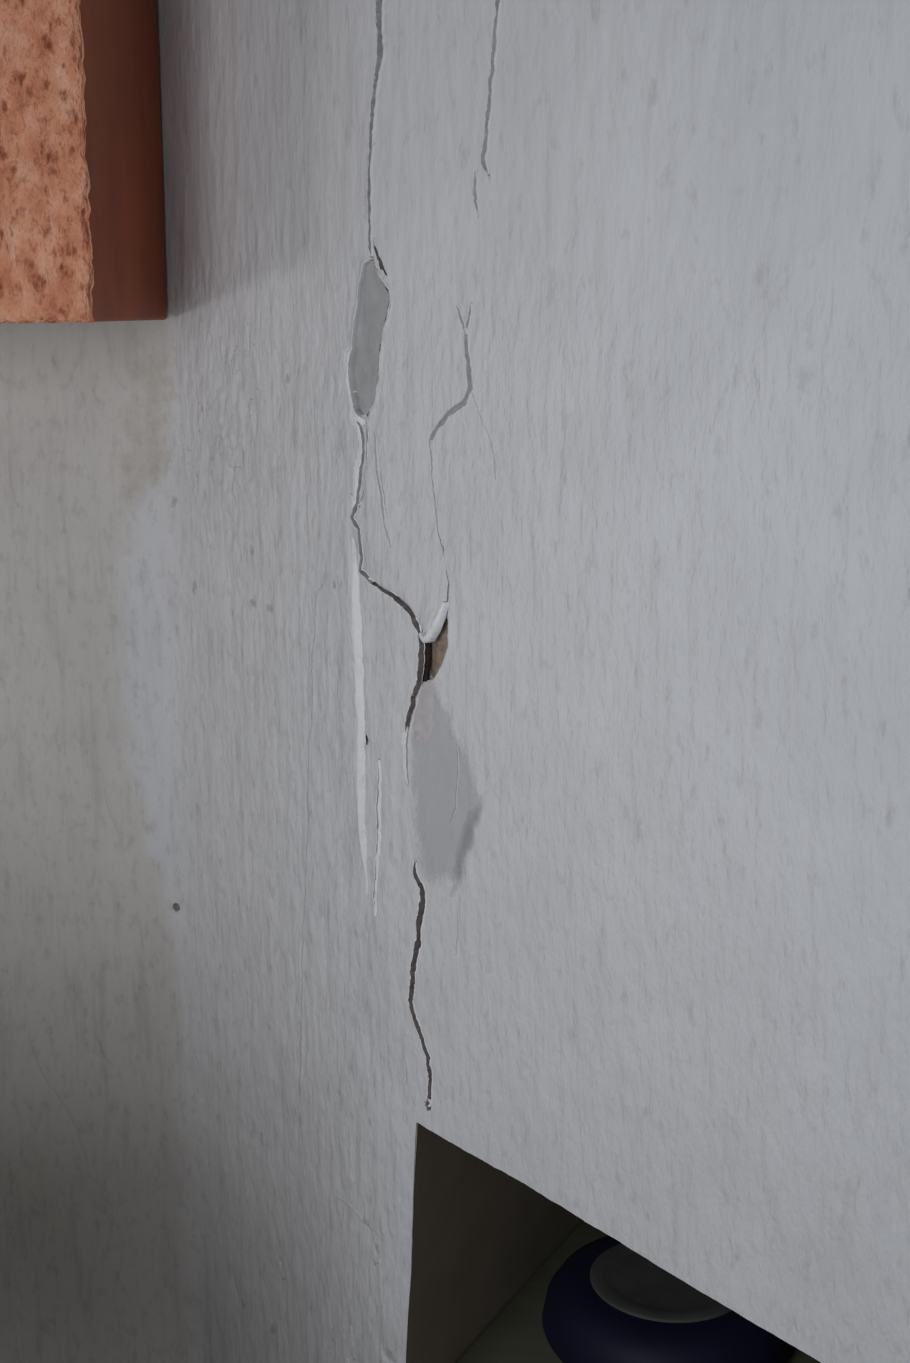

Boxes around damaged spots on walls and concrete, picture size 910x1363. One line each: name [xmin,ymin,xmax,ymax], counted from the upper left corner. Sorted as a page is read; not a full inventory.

crack [367,0,392,285]
crack [472,0,503,215]
flaking render [342,254,453,745]
crack [429,303,497,480]
crack [372,759,382,916]
crack [403,862,433,1114]